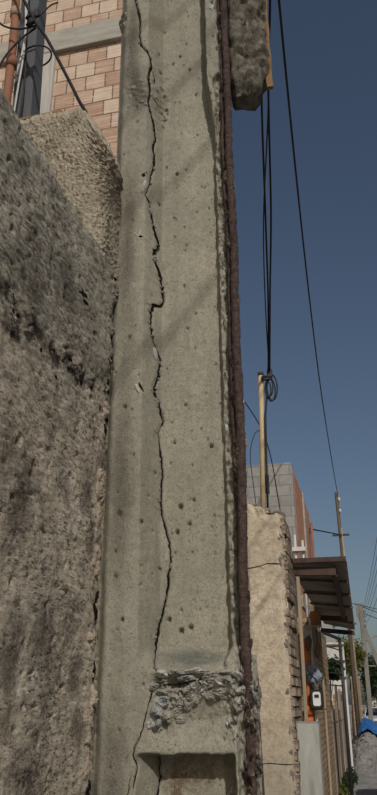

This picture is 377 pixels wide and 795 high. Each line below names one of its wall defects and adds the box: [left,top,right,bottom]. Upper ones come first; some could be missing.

crack [125,0,202,795]
spalling [146,637,262,745]
spalling [242,748,263,795]